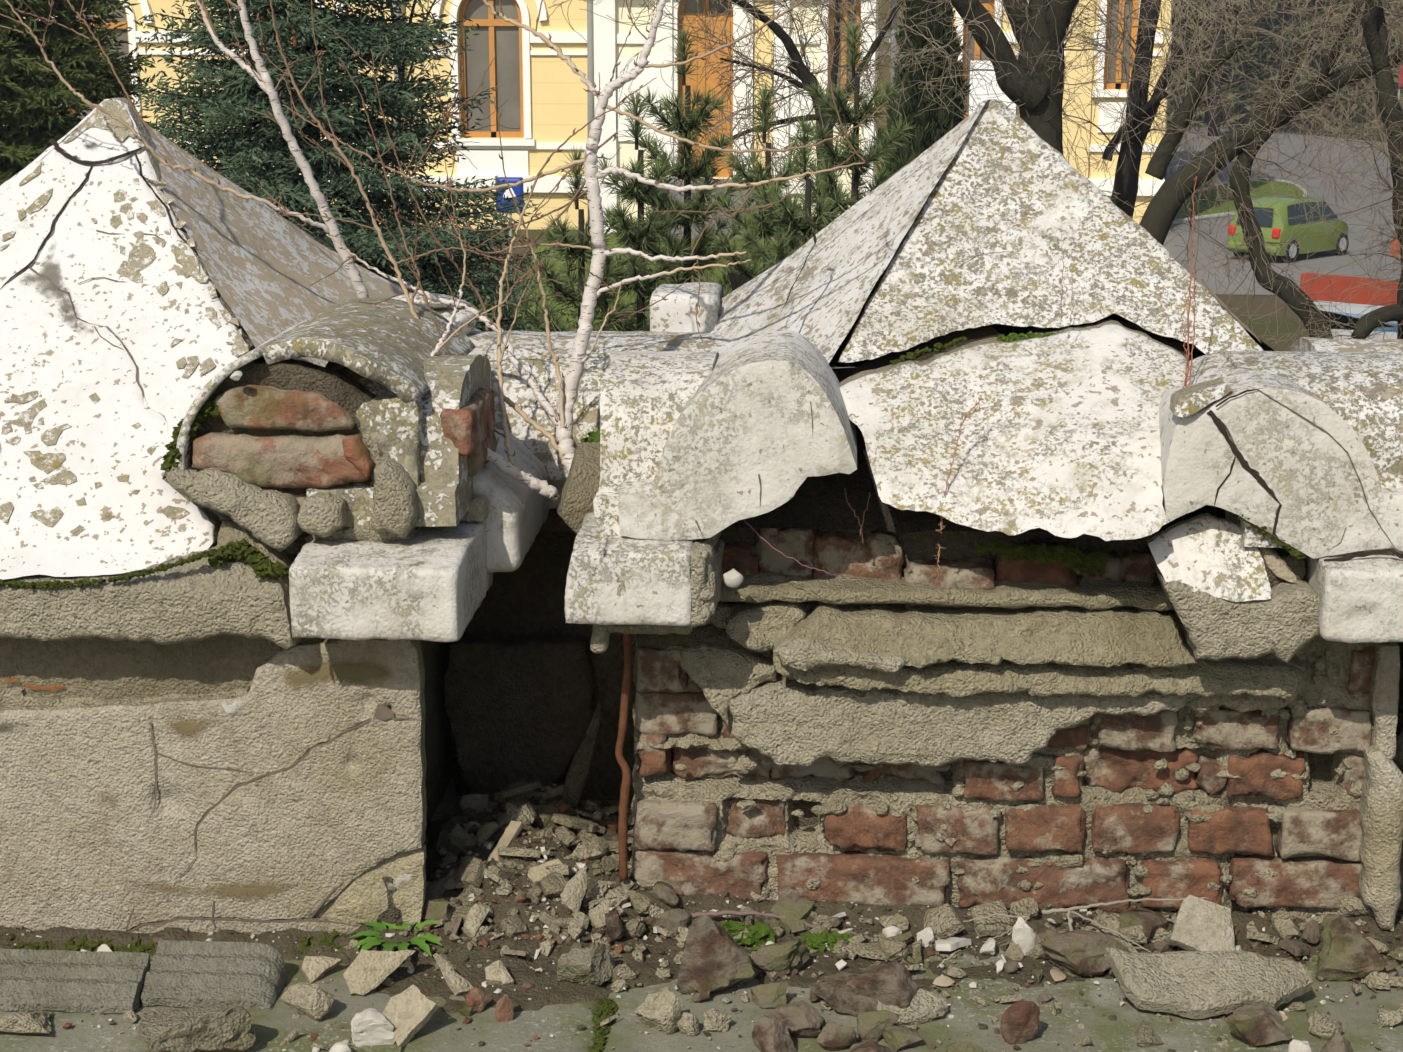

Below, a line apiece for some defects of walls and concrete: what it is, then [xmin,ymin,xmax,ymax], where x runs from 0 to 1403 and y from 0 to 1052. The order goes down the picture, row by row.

crack [2,138,204,422]
spalling [91,178,423,556]
peeling [0,502,14,522]
peeling [0,391,76,489]
peeling [30,474,139,536]
spalling [440,388,497,477]
crack [1207,388,1403,562]
spalling [708,568,744,629]
spalling [1170,609,1187,638]
crack [150,717,414,878]
spalling [313,634,1374,961]
crack [126,882,357,932]